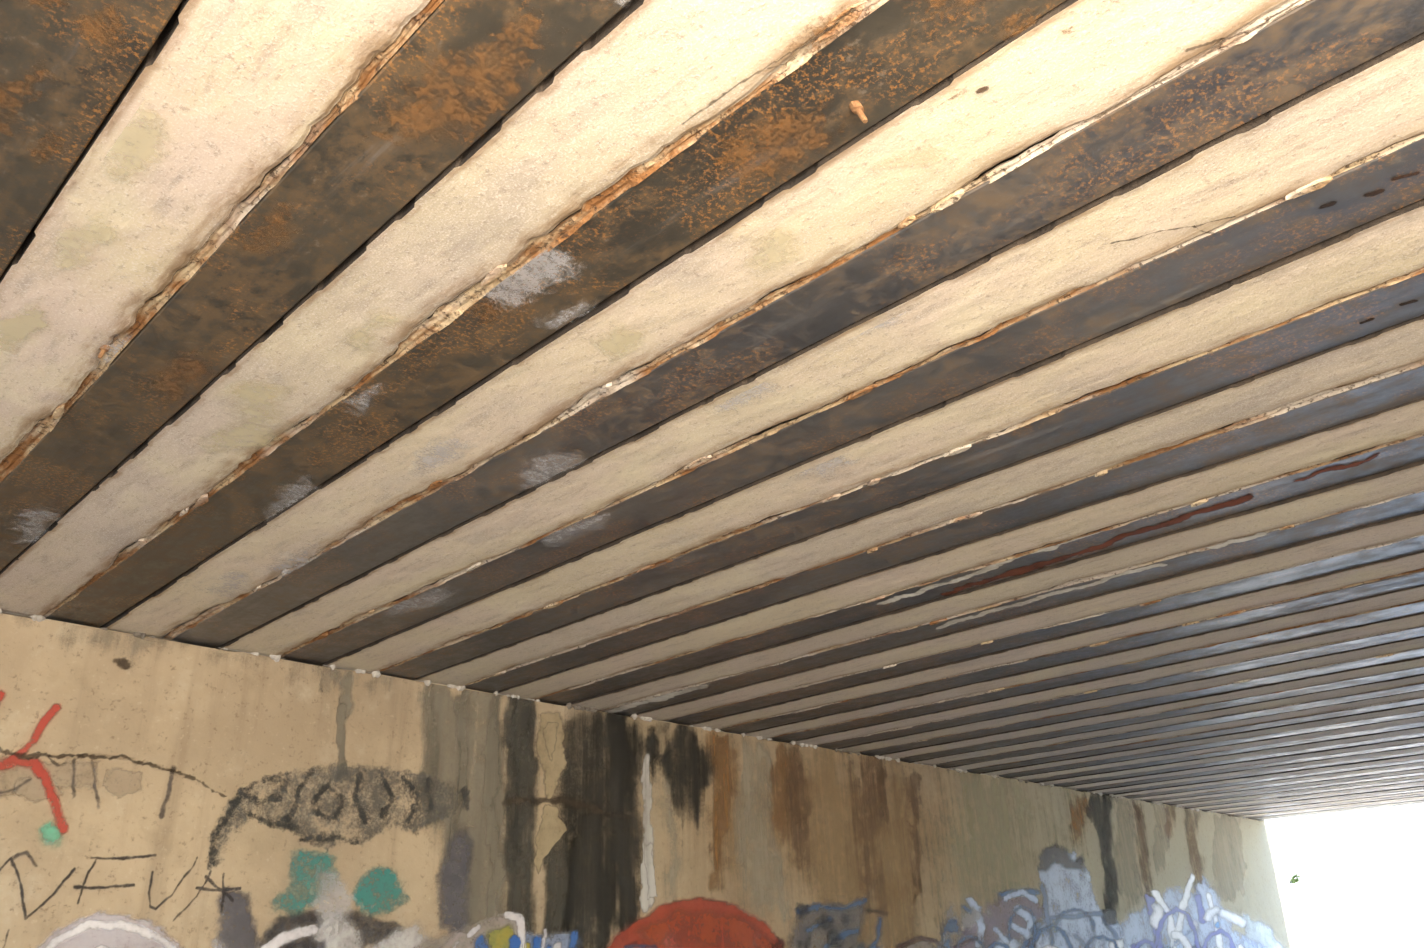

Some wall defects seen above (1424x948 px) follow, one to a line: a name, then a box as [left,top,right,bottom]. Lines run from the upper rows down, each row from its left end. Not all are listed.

rust [373,15,542,141]
rust [714,108,843,185]
spalling [0,0,1424,729]
rust [1294,453,1380,482]
rust [941,494,1254,596]
crack [0,748,226,797]
water stain [418,684,716,948]
rust [707,732,737,889]